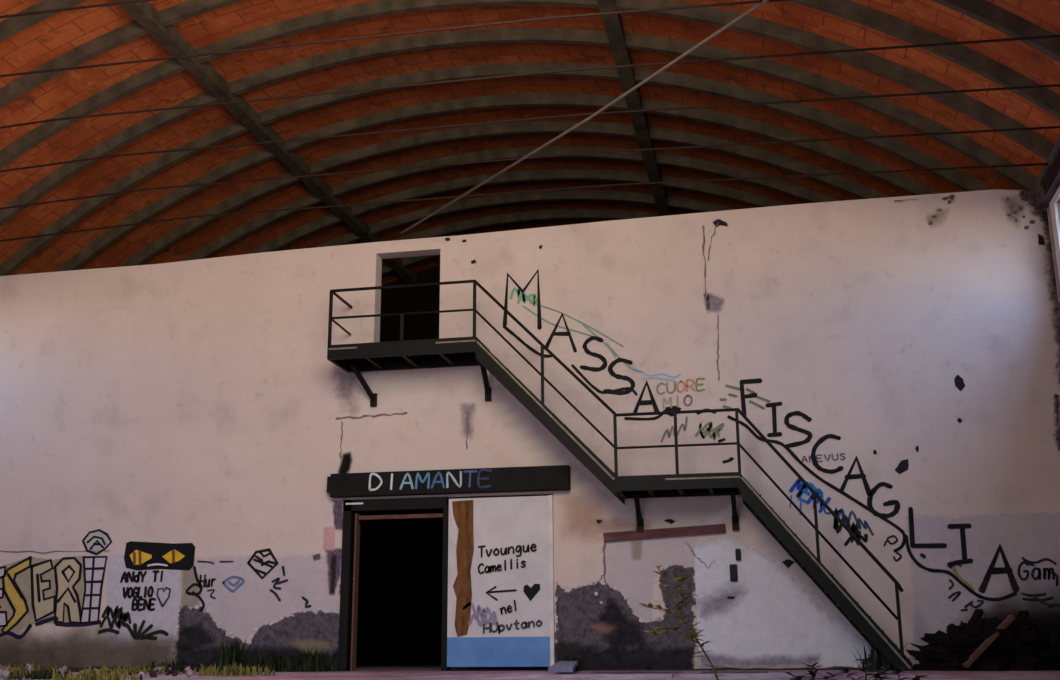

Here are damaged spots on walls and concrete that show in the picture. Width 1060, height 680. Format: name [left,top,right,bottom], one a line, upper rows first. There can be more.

leakage [1038,221,1060,382]
flaking render [174,606,340,671]
flaking render [527,565,792,678]